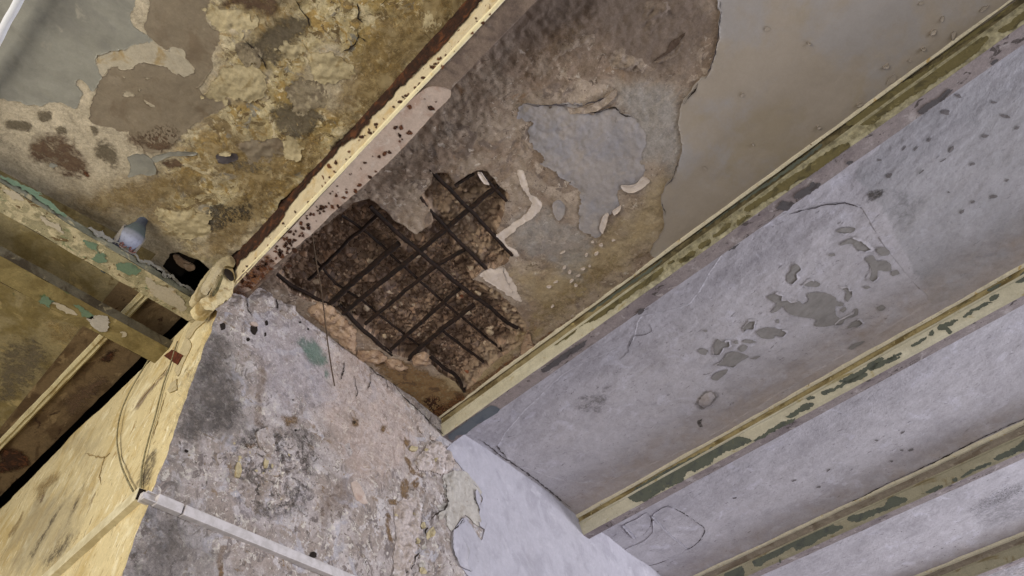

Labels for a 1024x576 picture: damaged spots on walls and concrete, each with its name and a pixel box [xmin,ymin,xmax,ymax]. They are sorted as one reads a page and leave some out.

peeling [0,175,67,234]
damp [5,111,89,177]
damp [89,126,198,212]
peeling [0,0,356,178]
spalling [83,86,565,393]
rust [231,0,491,296]
peeling [517,89,650,288]
peeling [541,0,1024,381]
rust [433,353,520,419]
peeling [628,271,1024,502]
peeling [392,406,661,576]
peeling [724,496,908,576]